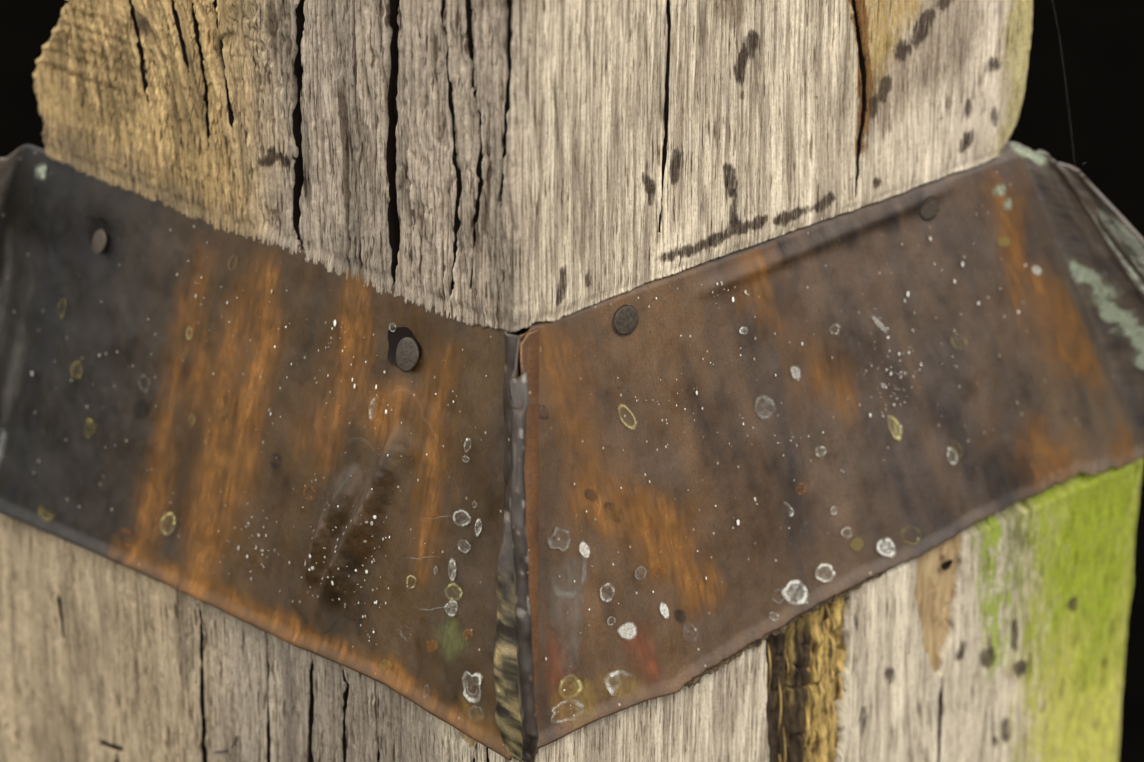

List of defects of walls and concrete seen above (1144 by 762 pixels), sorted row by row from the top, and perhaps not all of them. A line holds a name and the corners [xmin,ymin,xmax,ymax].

crack [172,0,234,147]
crack [292,0,305,251]
crack [386,0,400,284]
crack [852,0,866,198]
corrosion [162,269,277,597]
corrosion [319,314,363,434]
corrosion [419,386,443,560]
crack [199,606,208,762]
corrosion [371,663,412,692]
damp [981,646,995,669]
damp [992,719,1009,746]
damp [1011,620,1027,678]